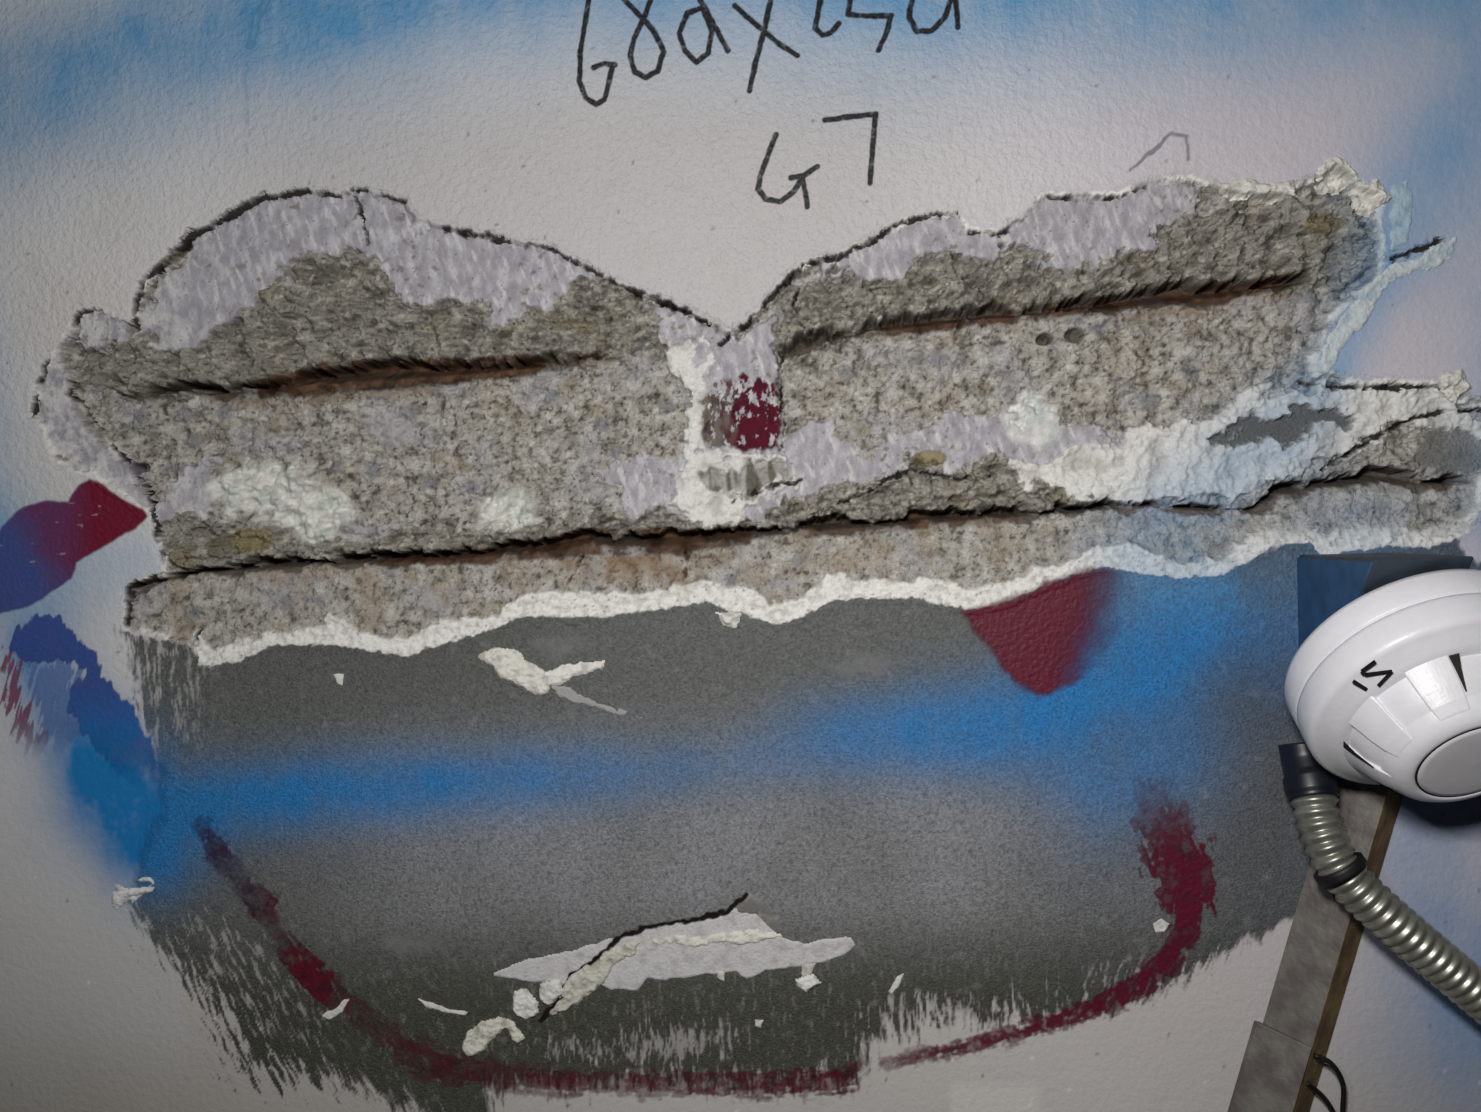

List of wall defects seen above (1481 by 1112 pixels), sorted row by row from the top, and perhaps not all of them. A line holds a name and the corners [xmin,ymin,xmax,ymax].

spalling [26,159,1481,718]
peeling [418,892,855,1057]